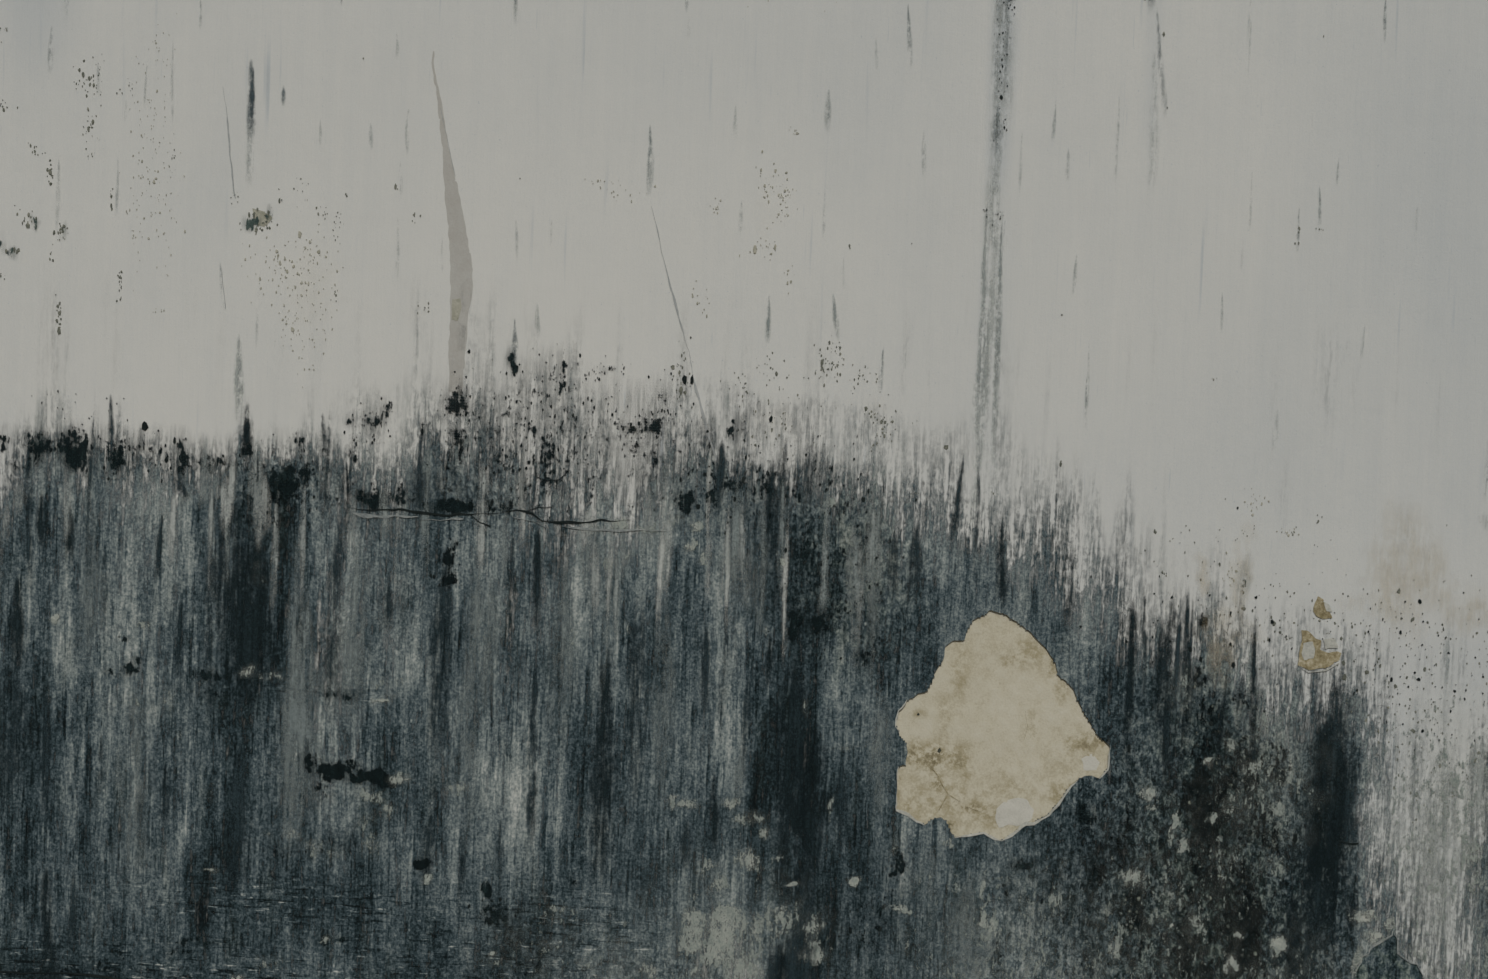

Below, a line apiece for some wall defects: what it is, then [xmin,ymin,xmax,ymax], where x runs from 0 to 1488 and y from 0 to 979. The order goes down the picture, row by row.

water stain [14,205,68,262]
water stain [73,32,186,276]
water stain [739,150,798,260]
water stain [977,189,1002,393]
water stain [993,0,1015,141]
peeling [612,517,708,565]
peeling [482,797,833,979]
peeling [669,794,696,810]
water stain [0,302,1488,979]
spalling [895,610,1111,849]
peeling [891,685,1488,979]
peeling [1298,597,1341,673]